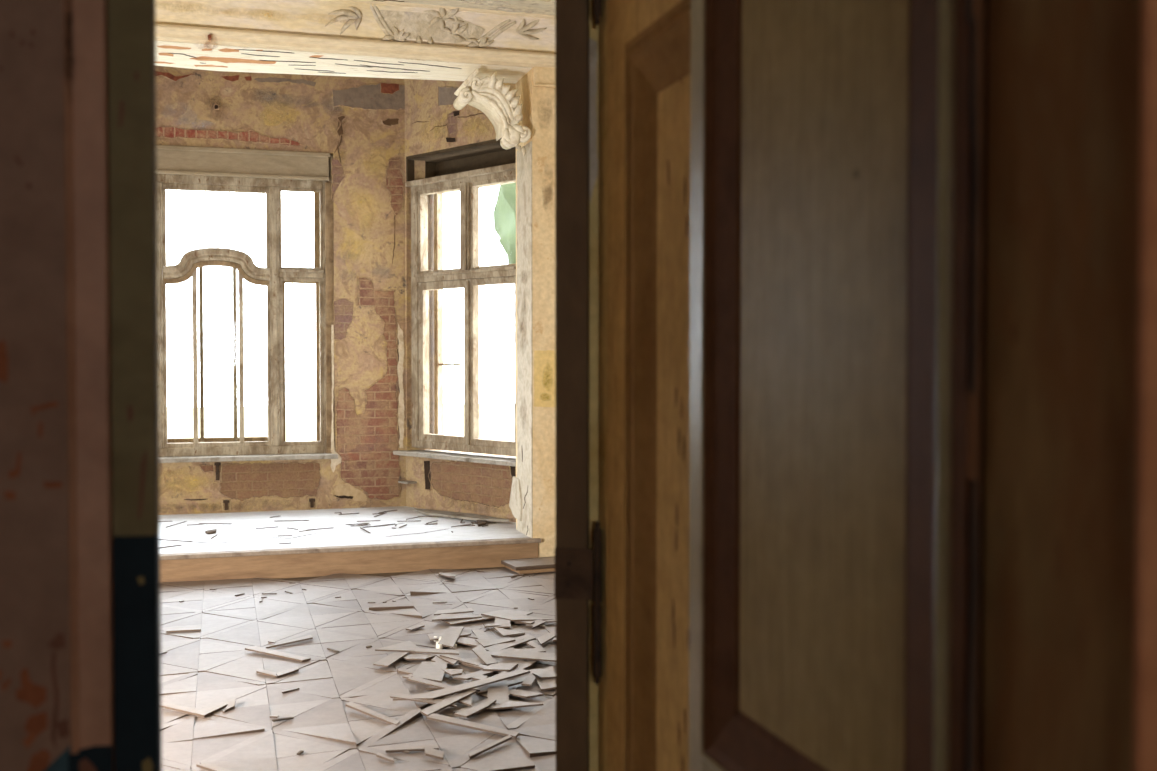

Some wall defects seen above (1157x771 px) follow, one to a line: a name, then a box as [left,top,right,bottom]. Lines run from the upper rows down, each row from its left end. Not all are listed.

spalling [156,70,195,82]
spalling [222,75,316,87]
spalling [332,82,405,111]
spalling [156,126,304,147]
spalling [385,157,405,216]
spalling [331,277,405,501]
spalling [199,461,322,501]
spalling [428,460,512,509]